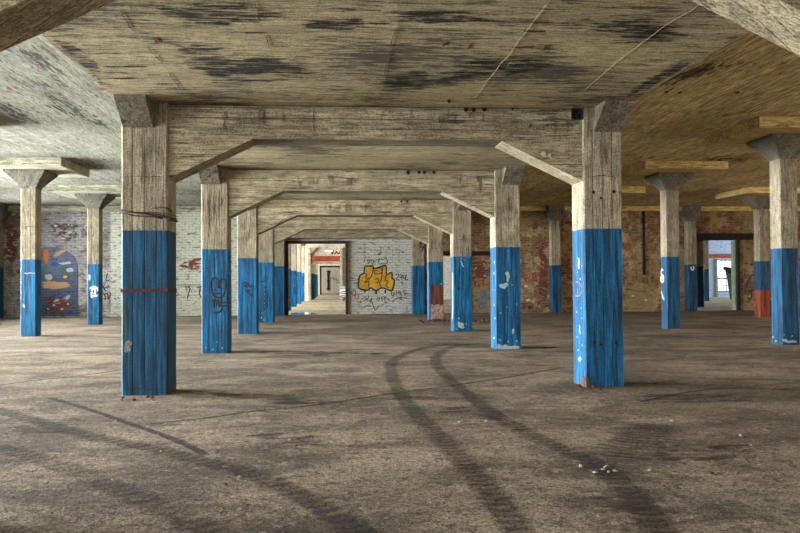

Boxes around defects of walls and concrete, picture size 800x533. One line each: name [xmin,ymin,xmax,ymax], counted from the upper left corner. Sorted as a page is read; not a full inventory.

damp [175,42,316,85]
damp [159,2,504,34]
damp [367,58,552,89]
crack [478,5,546,94]
crack [589,4,699,86]
peeling [430,272,465,329]
flaking render [494,237,549,319]
peeling [493,329,520,349]